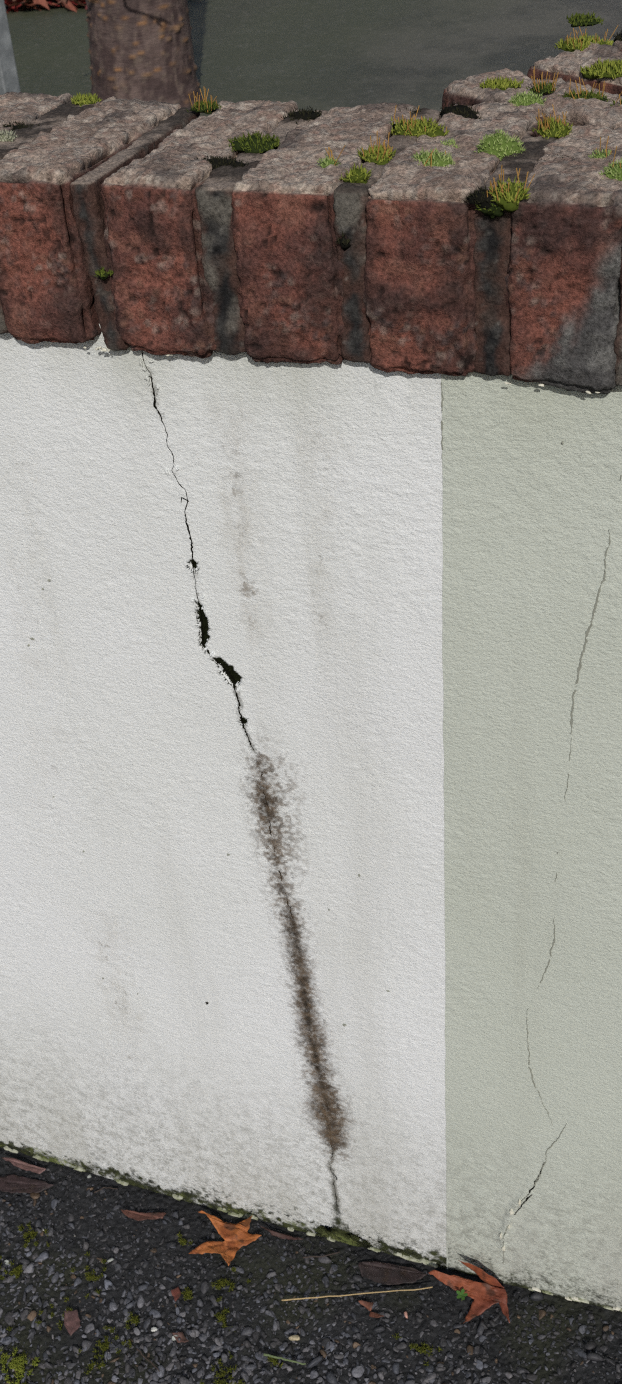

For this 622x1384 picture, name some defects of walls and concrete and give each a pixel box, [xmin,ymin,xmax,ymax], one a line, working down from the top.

crack [139,351,292,916]
crack [564,530,611,798]
water stain [255,755,344,1152]
crack [327,1122,339,1207]
crack [526,1022,553,1125]
crack [538,917,555,987]